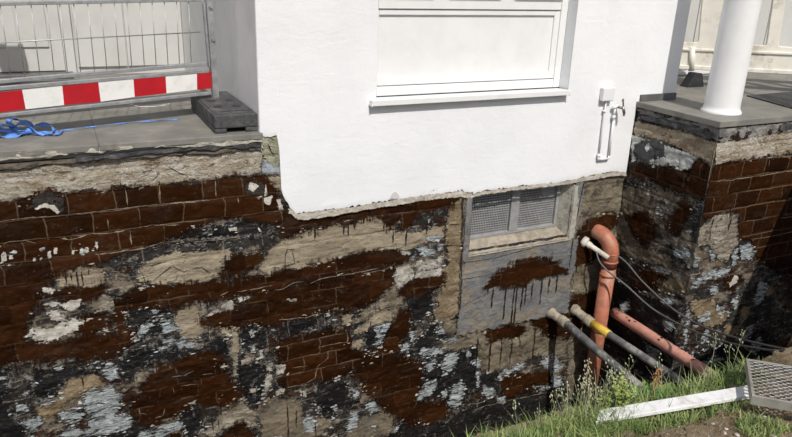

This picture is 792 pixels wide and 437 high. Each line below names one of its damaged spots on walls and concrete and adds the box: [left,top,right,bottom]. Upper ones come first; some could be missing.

spalling [631,121,792,171]
leakage [629,150,792,275]
leakage [0,171,462,437]
spalling [0,136,775,409]
leakage [482,209,658,372]
leakage [632,266,672,294]
leakage [724,269,744,294]
spalling [15,326,400,437]
leakage [500,368,553,404]